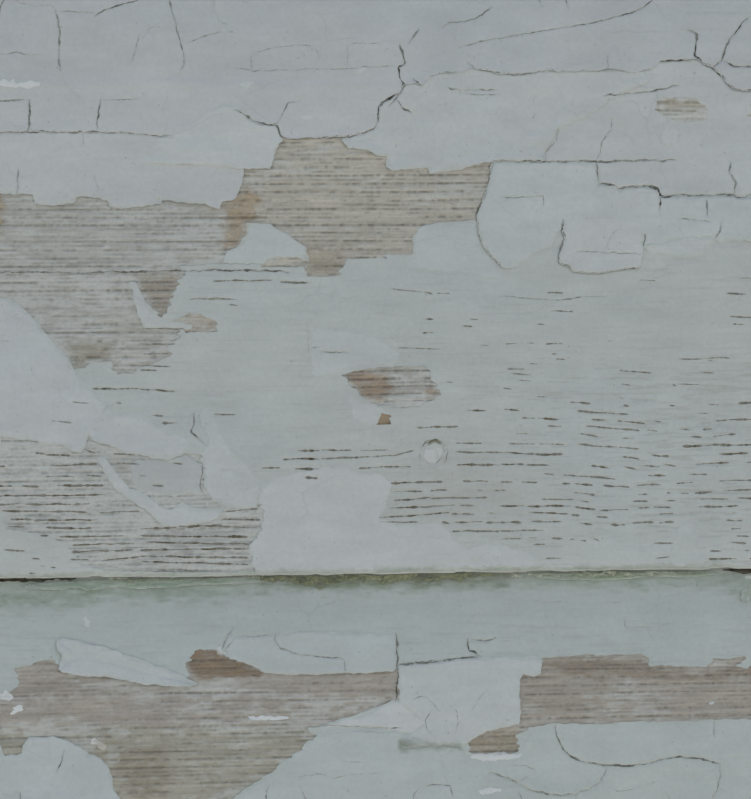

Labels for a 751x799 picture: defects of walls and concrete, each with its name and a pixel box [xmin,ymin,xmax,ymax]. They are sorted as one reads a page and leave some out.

crack [0,0,138,67]
crack [0,98,166,143]
crack [234,0,751,139]
crack [475,124,748,265]
peeling [0,59,751,590]
peeling [0,632,751,799]
crack [491,726,721,799]